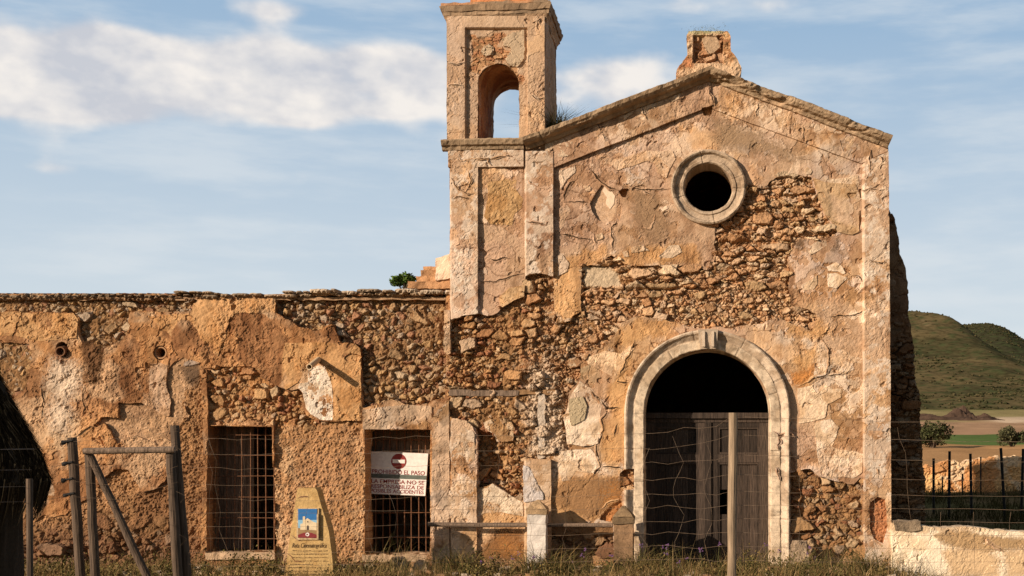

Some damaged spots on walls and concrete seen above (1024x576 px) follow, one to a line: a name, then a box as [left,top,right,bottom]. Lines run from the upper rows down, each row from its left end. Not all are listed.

spalling [0,162,889,566]
crack [451,151,670,250]